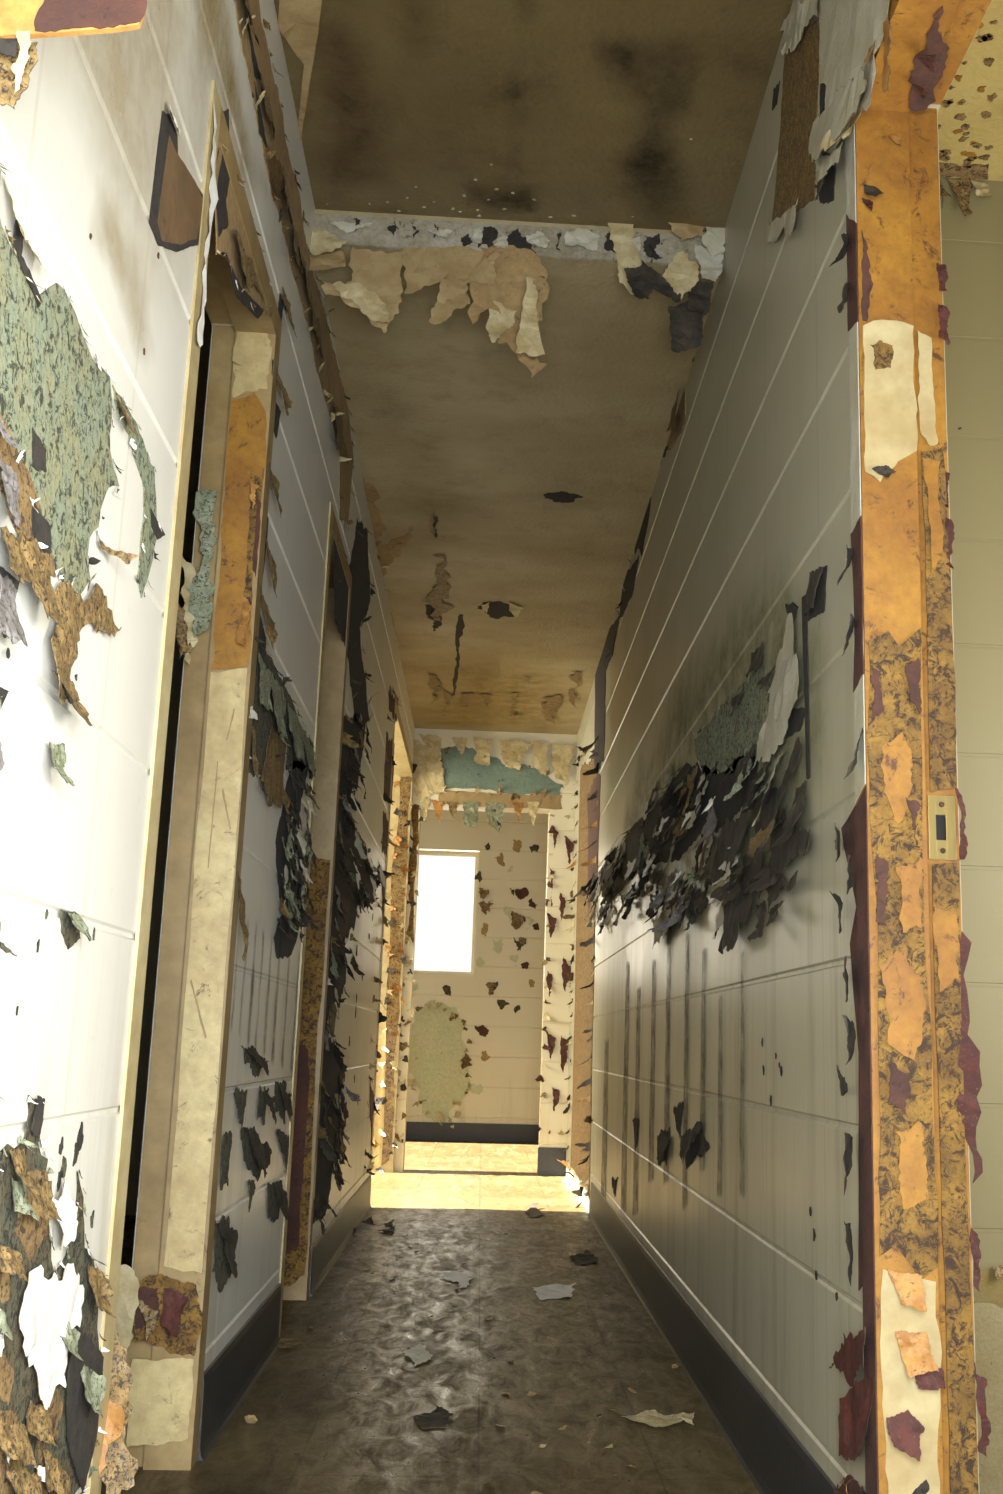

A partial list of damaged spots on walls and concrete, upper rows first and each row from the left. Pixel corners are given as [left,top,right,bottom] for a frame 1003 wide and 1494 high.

peeling [0,30,38,110]
peeling [0,163,165,726]
peeling [944,471,955,570]
peeling [49,742,75,787]
peeling [149,0,951,1494]
peeling [955,788,968,860]
peeling [957,932,983,1184]
peeling [0,1095,140,1494]
peeling [969,1228,1003,1494]